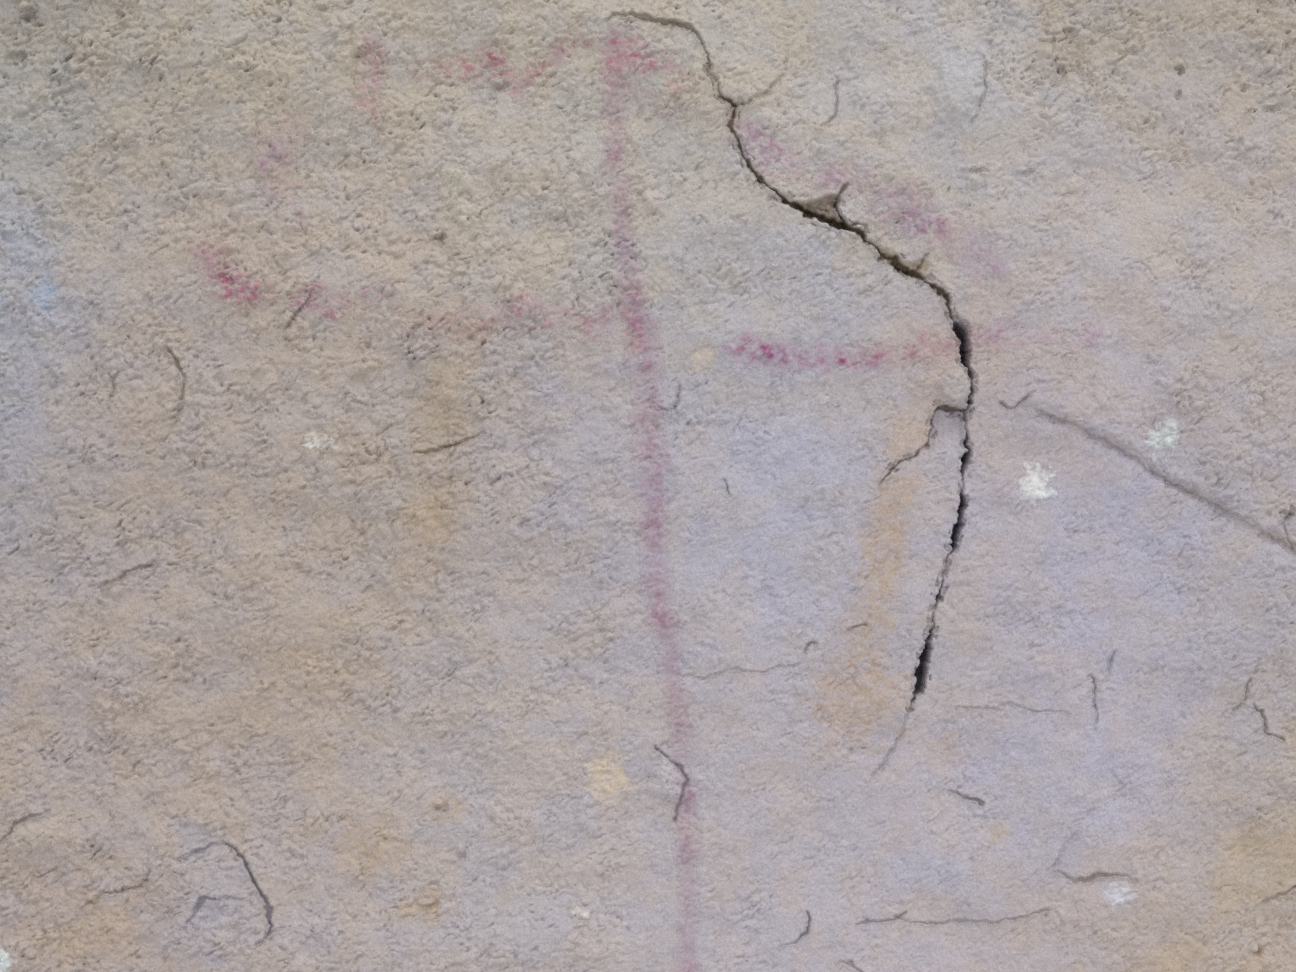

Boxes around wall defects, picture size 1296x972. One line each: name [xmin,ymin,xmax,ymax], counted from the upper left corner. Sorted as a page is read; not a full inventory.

crack [603,10,1296,782]